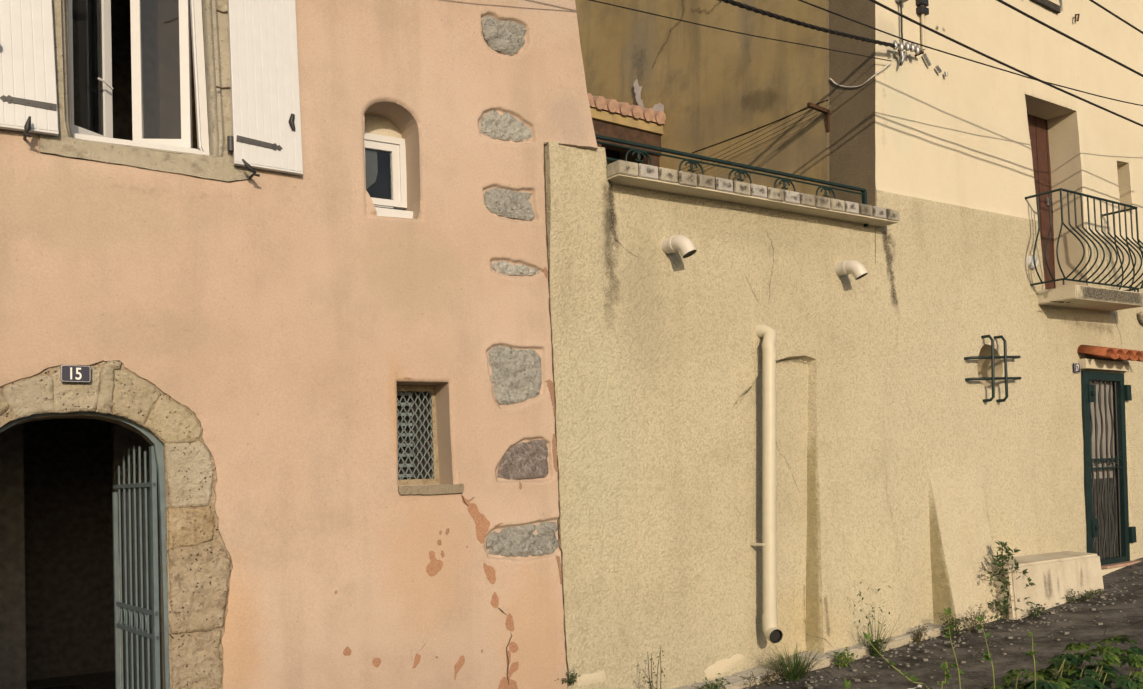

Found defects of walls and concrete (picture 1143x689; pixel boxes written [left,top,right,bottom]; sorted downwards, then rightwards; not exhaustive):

damp [883,234,897,303]
flaking render [426,528,450,577]
flaking render [462,495,562,689]
flaking render [454,655,465,679]
crack [499,608,512,684]